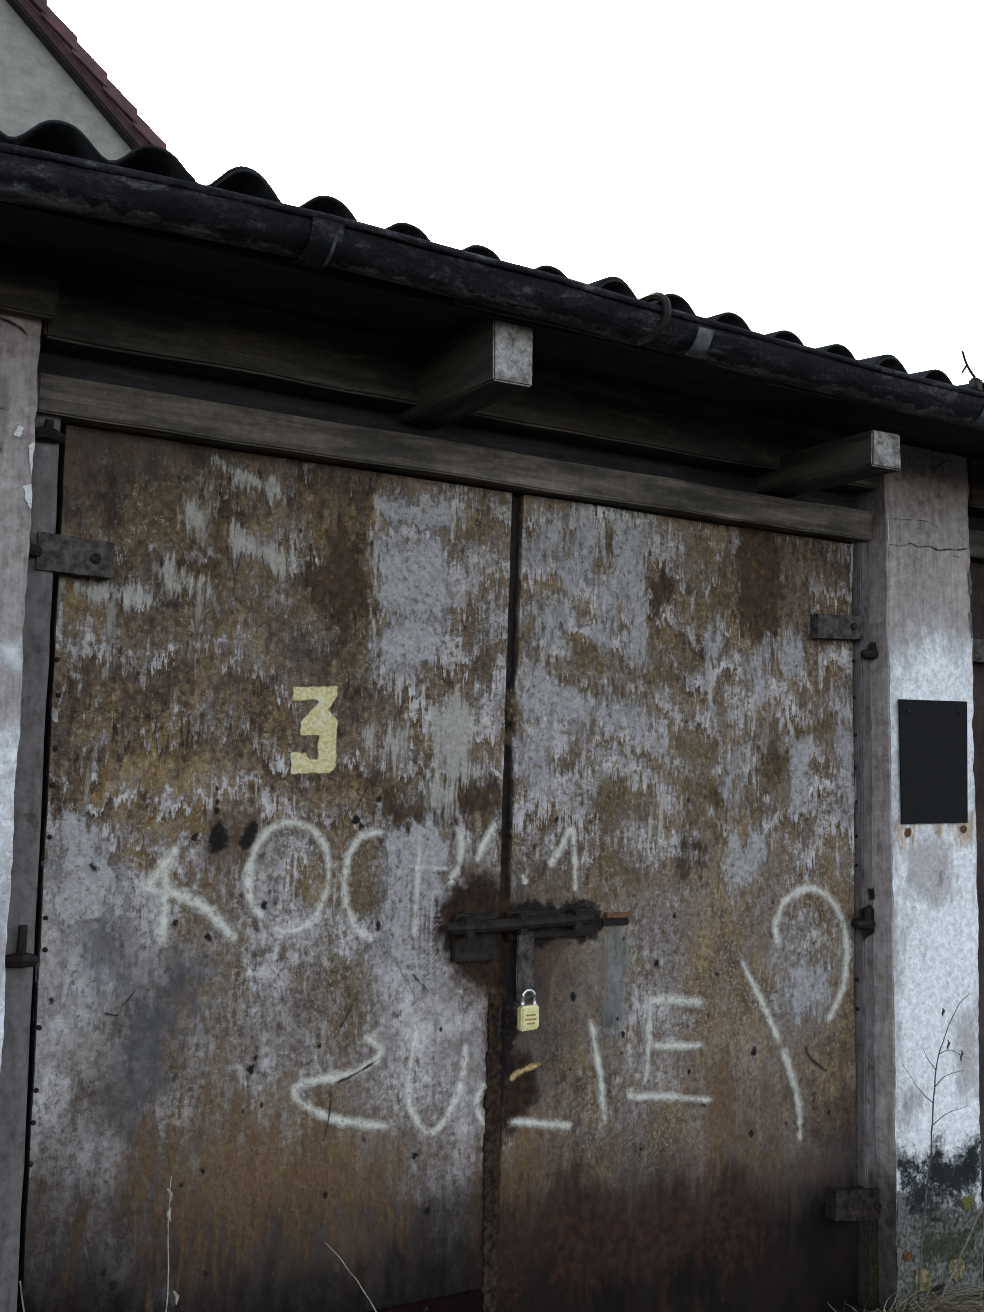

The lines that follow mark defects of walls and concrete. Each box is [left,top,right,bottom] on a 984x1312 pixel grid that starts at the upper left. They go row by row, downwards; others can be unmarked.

peeling [211,460,286,506]
peeling [61,553,210,610]
peeling [230,520,285,580]
peeling [357,487,459,679]
crack [890,518,967,557]
peeling [512,512,651,796]
peeling [748,629,803,702]
peeling [789,734,814,819]
peeling [830,682,856,810]
peeling [376,686,483,1005]
peeling [722,827,767,896]
water stain [896,1135,984,1310]